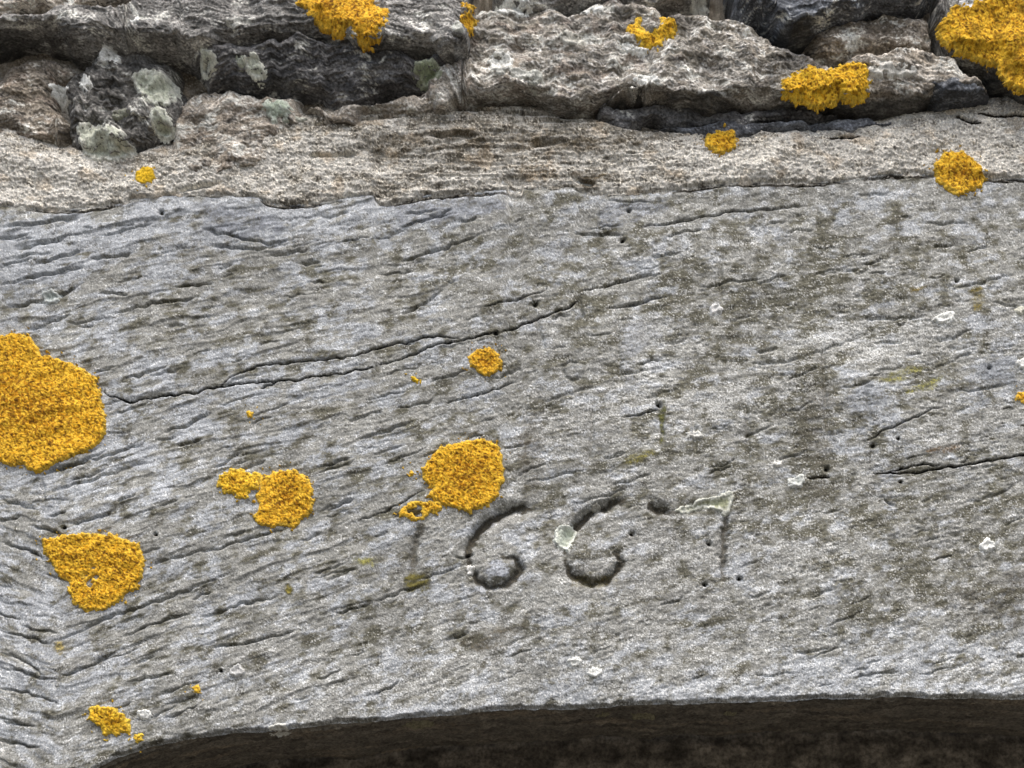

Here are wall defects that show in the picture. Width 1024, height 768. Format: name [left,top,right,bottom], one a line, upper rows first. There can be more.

crack [876,454,1024,475]